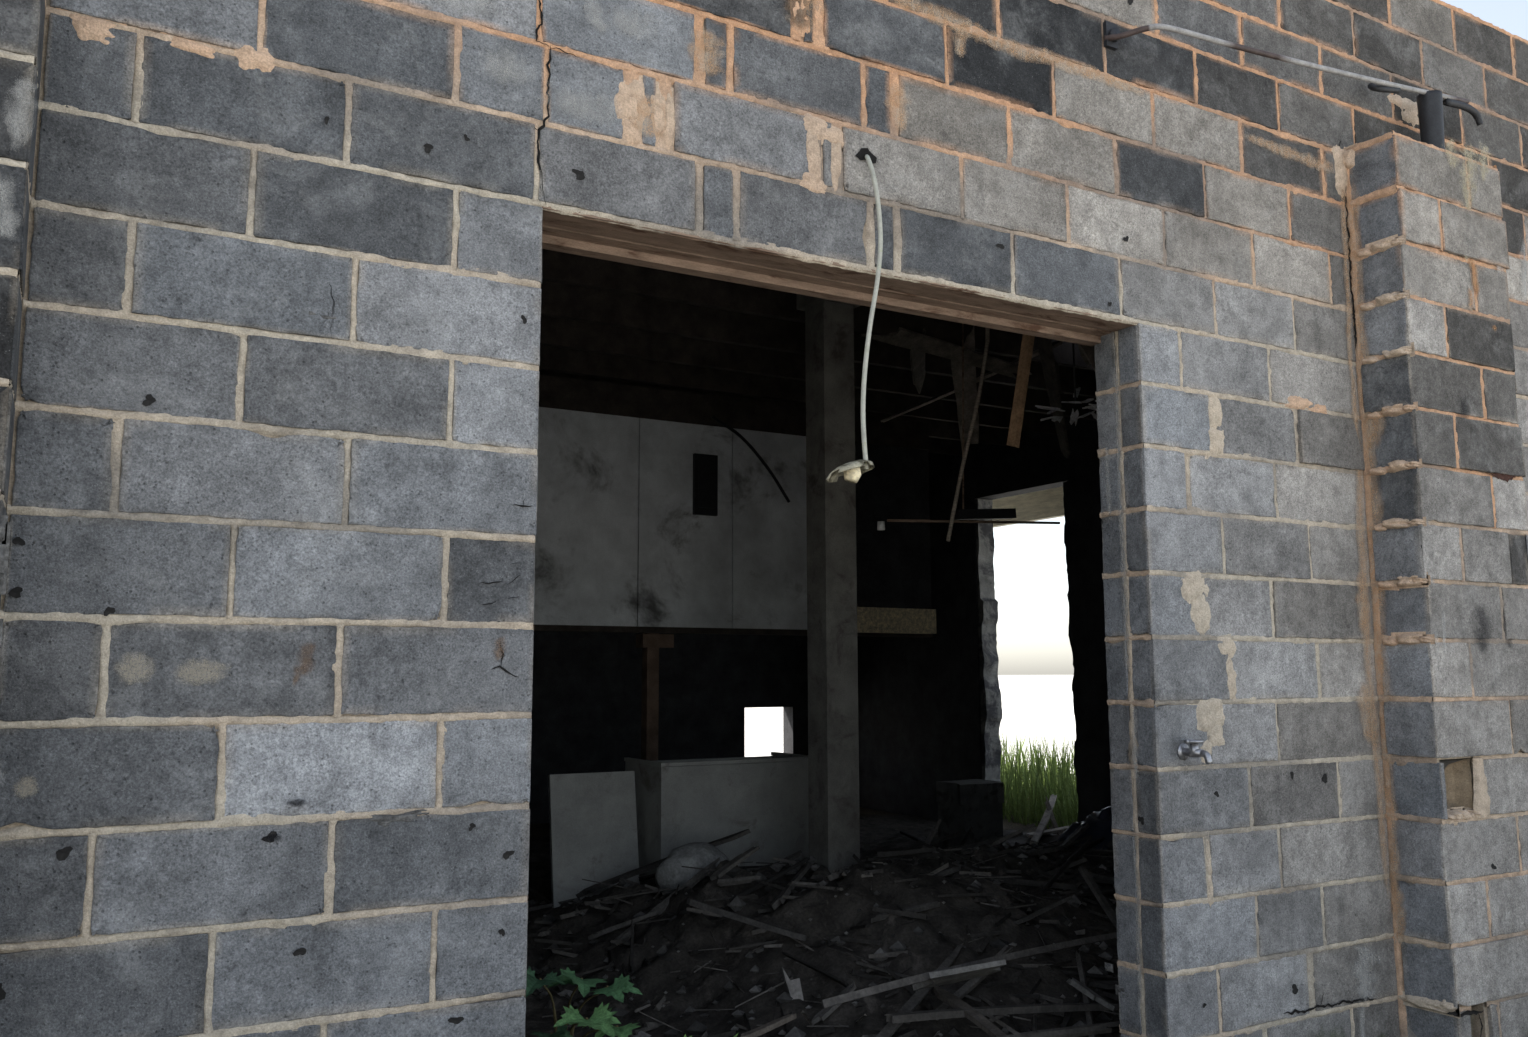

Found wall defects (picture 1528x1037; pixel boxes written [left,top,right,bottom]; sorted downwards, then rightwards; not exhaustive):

crack [508,0,575,203]
crack [1344,191,1357,349]
crack [1283,995,1374,1015]